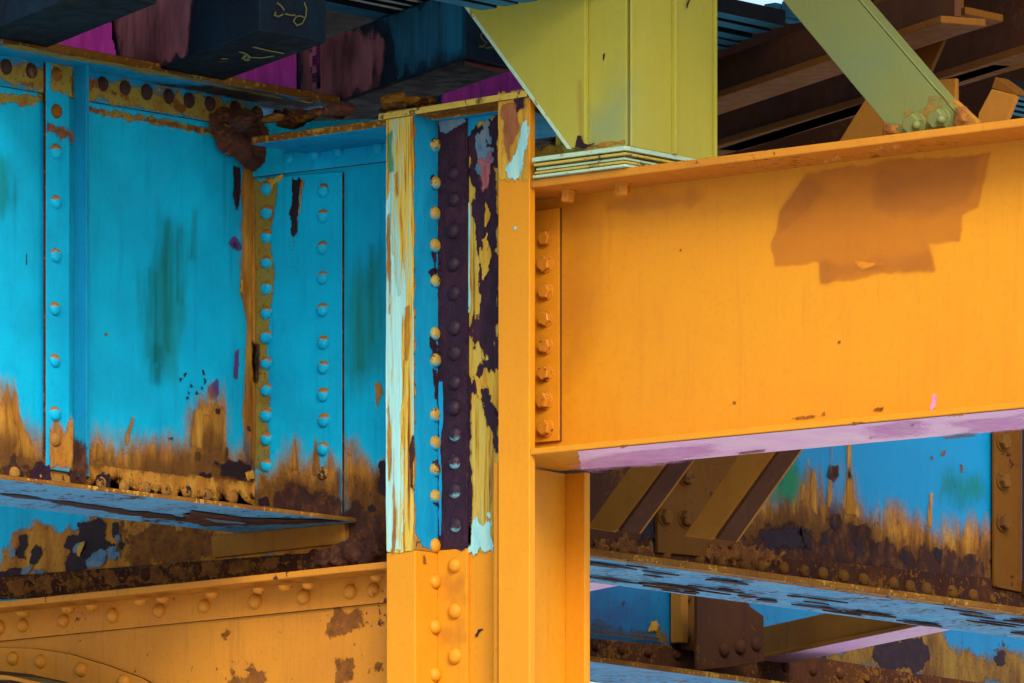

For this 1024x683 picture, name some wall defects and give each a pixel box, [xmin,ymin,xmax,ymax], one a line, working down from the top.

corrosion [0,44,329,137]
peeling [289,178,304,250]
corrosion [0,167,389,597]
peeling [386,131,415,554]
peeling [437,115,498,551]
peeling [0,494,346,576]
corrosion [706,445,992,578]
corrosion [325,608,367,638]
peeling [590,562,942,673]
corrosion [816,645,880,668]
corrosion [894,632,1024,683]
peeling [944,608,1024,635]